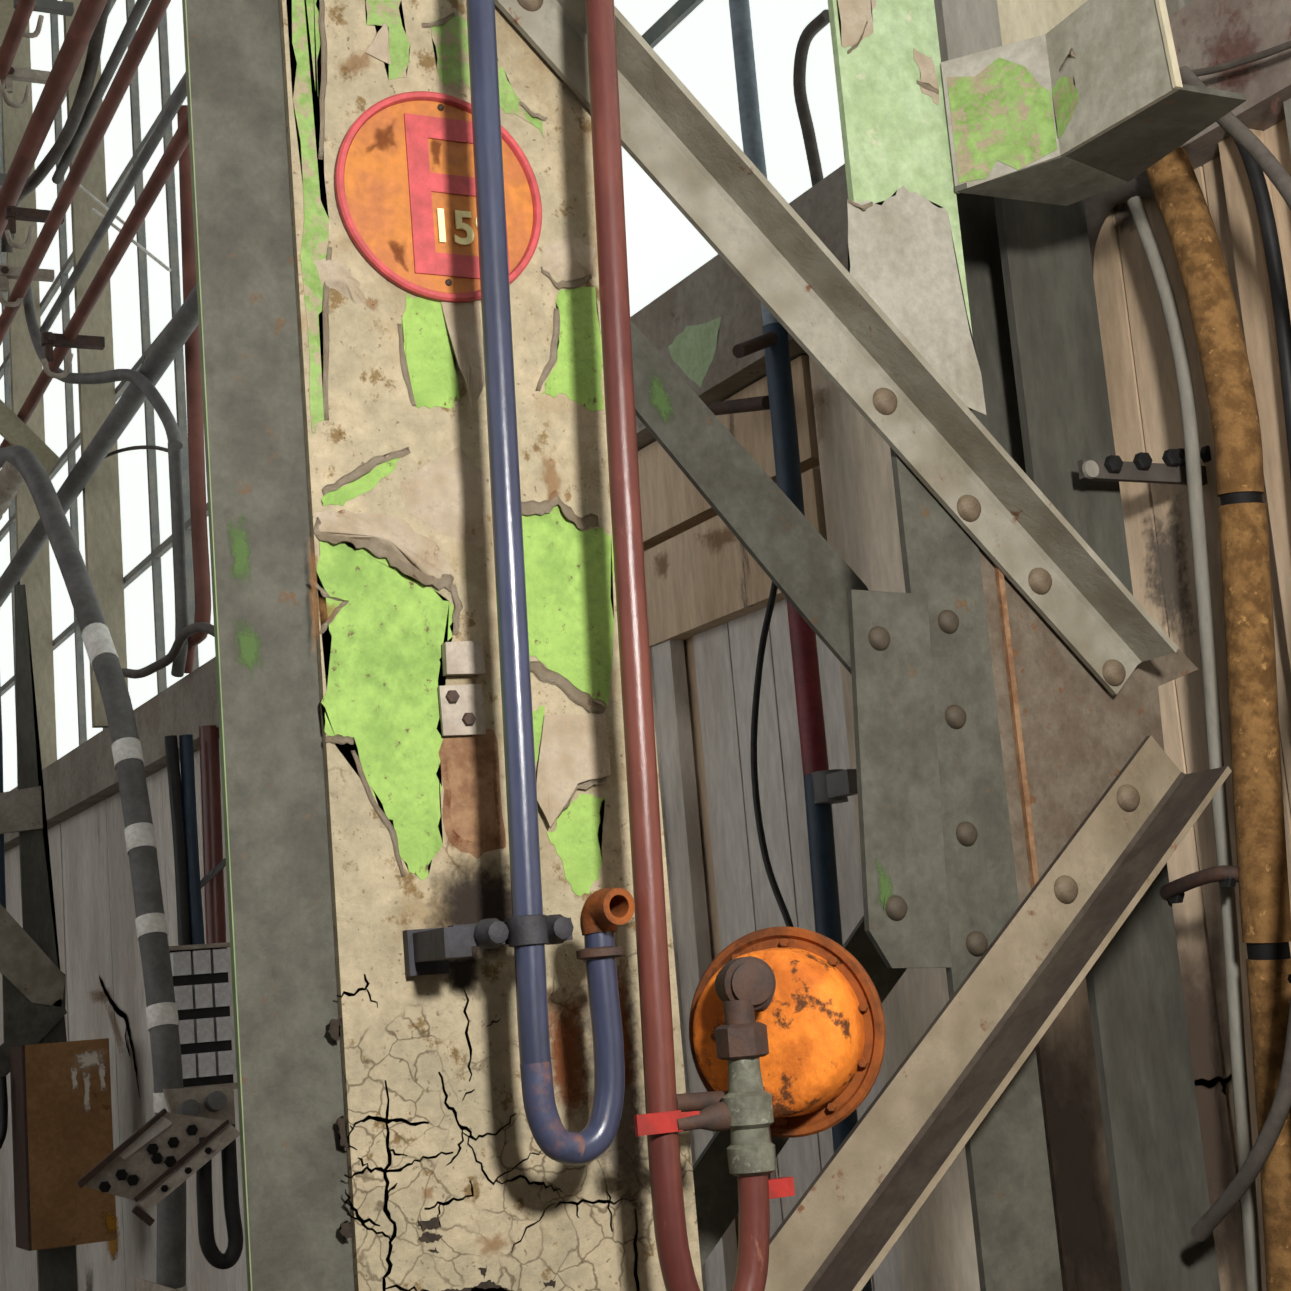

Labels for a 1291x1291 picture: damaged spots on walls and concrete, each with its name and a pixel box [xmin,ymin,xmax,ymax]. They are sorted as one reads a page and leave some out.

peeling [422,12,470,88]
peeling [286,0,332,433]
peeling [397,293,485,409]
peeling [535,267,604,412]
peeling [308,447,463,880]
peeling [521,490,614,896]
crack [99,975,140,1098]
crack [337,974,378,1008]
crack [344,989,640,1291]
corrosion [547,993,587,1116]
corrosion [617,968,632,1084]
crack [1194,1074,1232,1095]